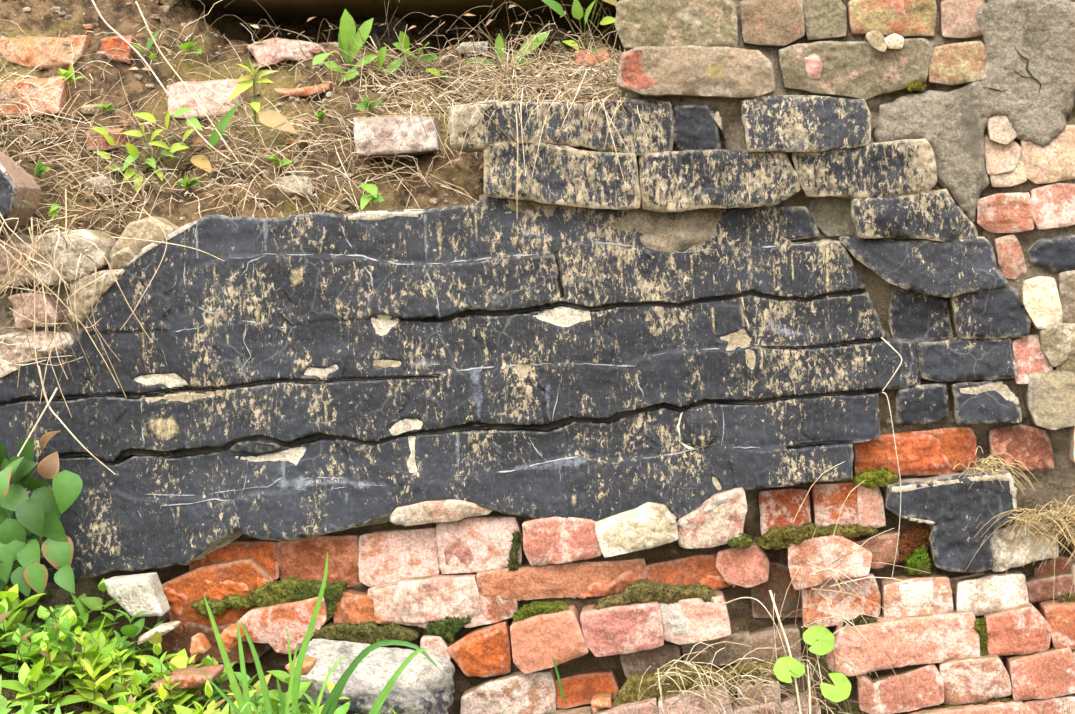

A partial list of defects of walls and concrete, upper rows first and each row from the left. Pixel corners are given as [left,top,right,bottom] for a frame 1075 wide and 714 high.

crack [982,46,1042,95]
peeling [533,306,591,327]
crack [0,223,886,536]
peeling [389,419,423,473]